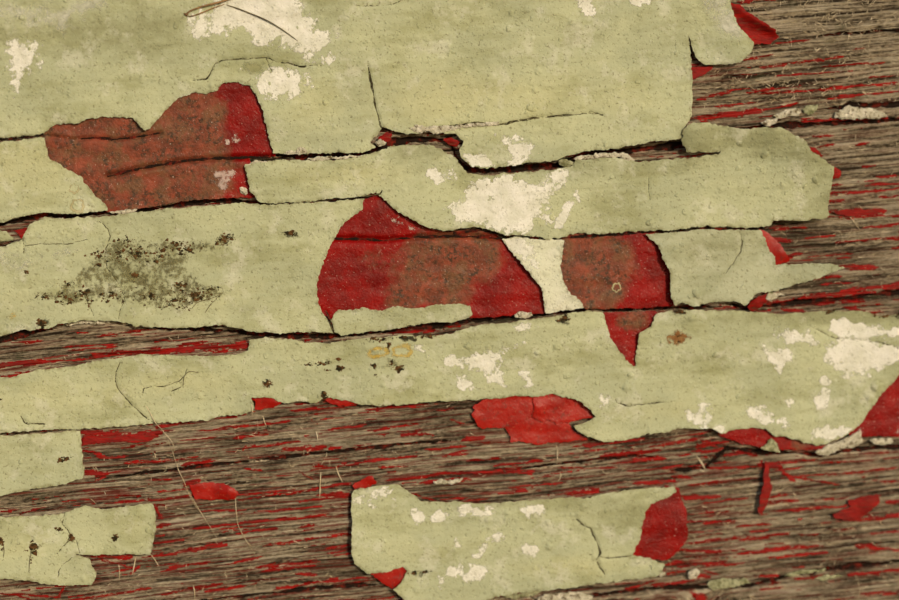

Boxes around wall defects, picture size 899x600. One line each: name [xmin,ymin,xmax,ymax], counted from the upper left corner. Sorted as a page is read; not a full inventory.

crack [193,57,321,81]
crack [0,133,44,141]
crack [80,132,160,141]
crack [107,65,685,177]
peeling [0,0,844,336]
peeling [834,208,885,217]
crack [0,190,383,320]
peeling [0,309,899,496]
peeling [0,503,156,586]
peeling [190,482,238,500]
peeling [351,476,676,600]
peeling [833,494,880,521]